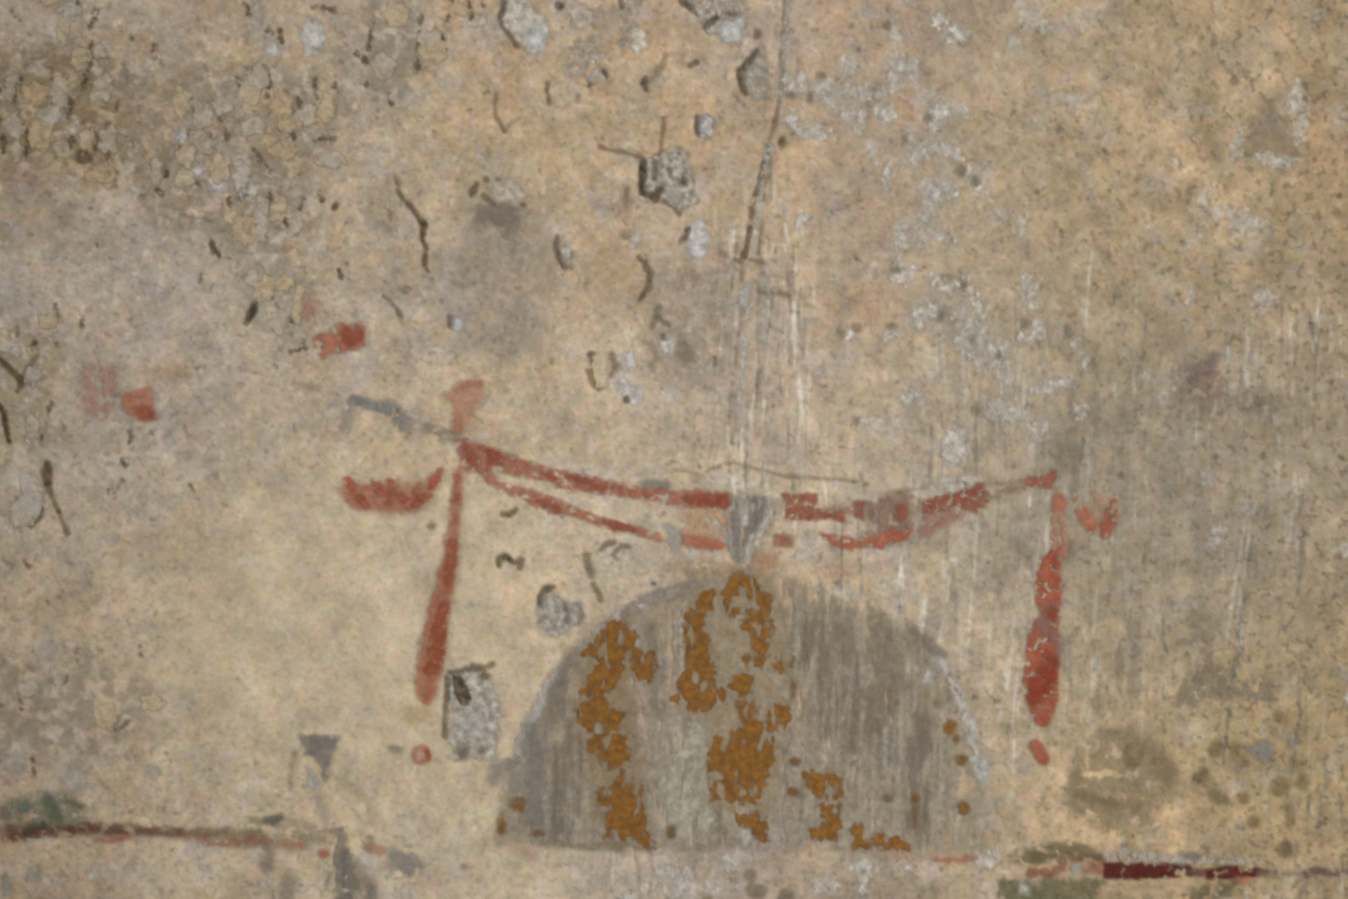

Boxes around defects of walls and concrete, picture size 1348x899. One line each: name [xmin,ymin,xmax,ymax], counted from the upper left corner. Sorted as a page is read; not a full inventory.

peeling [0,0,118,184]
peeling [150,29,347,246]
peeling [300,6,334,56]
spalling [695,114,716,138]
spalling [681,0,768,100]
crack [397,183,428,271]
spalling [639,147,709,257]
peeling [242,264,310,353]
spalling [444,662,500,761]